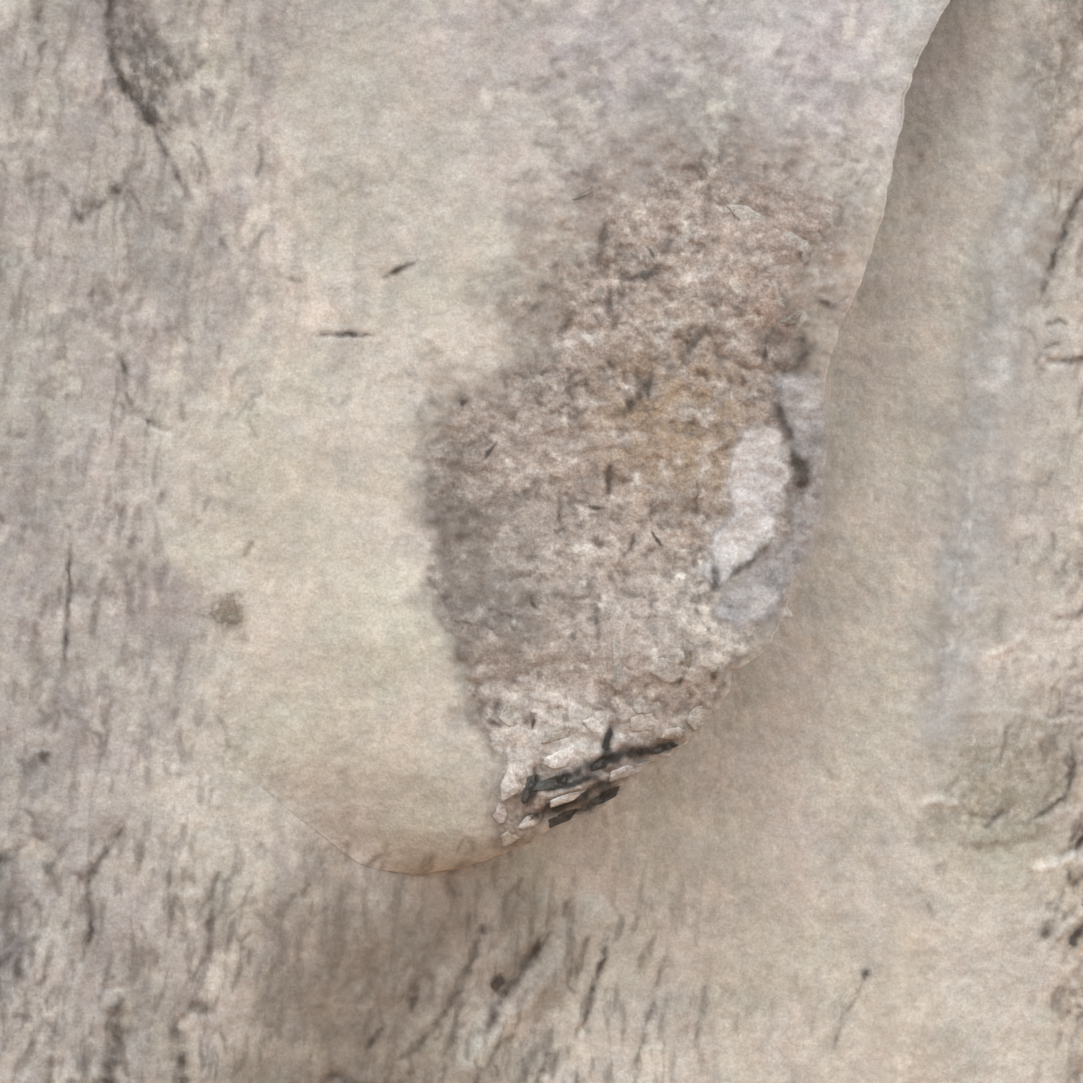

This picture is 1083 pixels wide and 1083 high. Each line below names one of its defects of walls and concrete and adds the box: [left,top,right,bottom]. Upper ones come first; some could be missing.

peeling [166,0,950,875]
peeling [1069,927,1083,946]